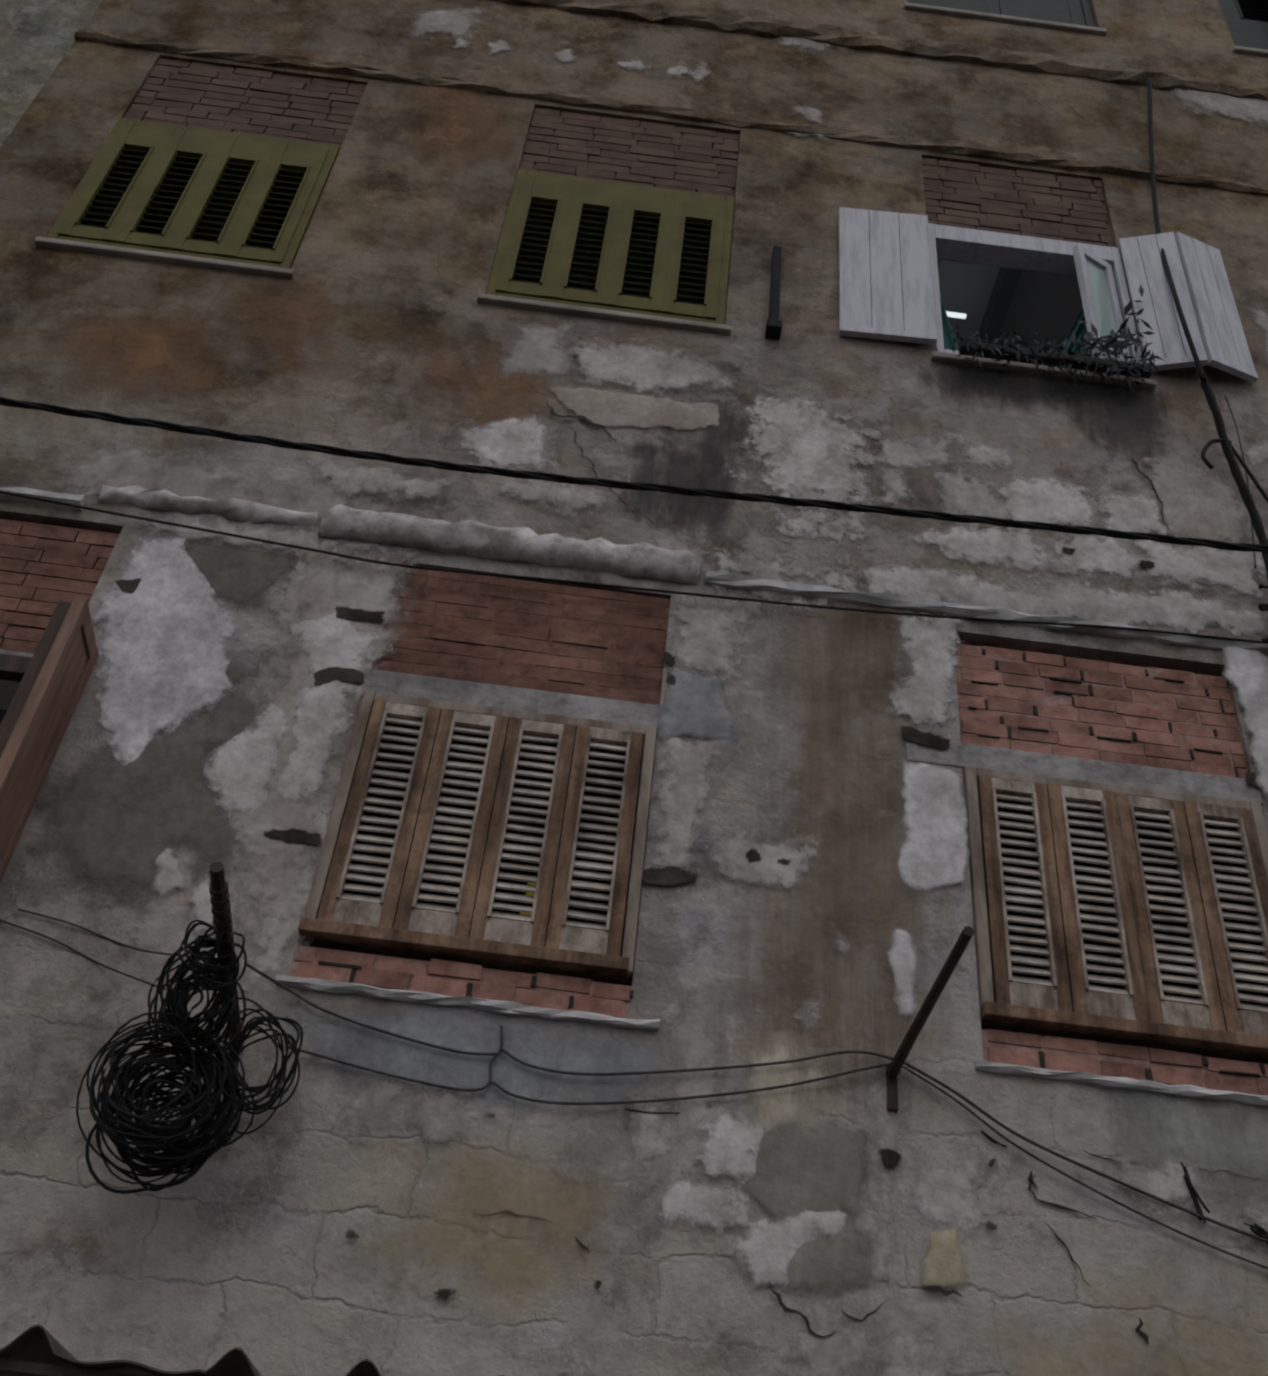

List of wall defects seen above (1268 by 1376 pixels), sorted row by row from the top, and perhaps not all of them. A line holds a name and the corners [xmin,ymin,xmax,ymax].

peeling [498,324,731,431]
crack [547,402,661,529]
crack [1131,458,1175,537]
peeling [663,392,1268,890]
peeling [70,416,611,992]
peeling [642,732,739,886]
peeling [889,930,916,1016]
peeling [610,1104,847,1287]
crack [1028,1171,1097,1287]
crack [1082,1149,1142,1165]
crack [770,1283,888,1338]
crack [920,1286,962,1296]